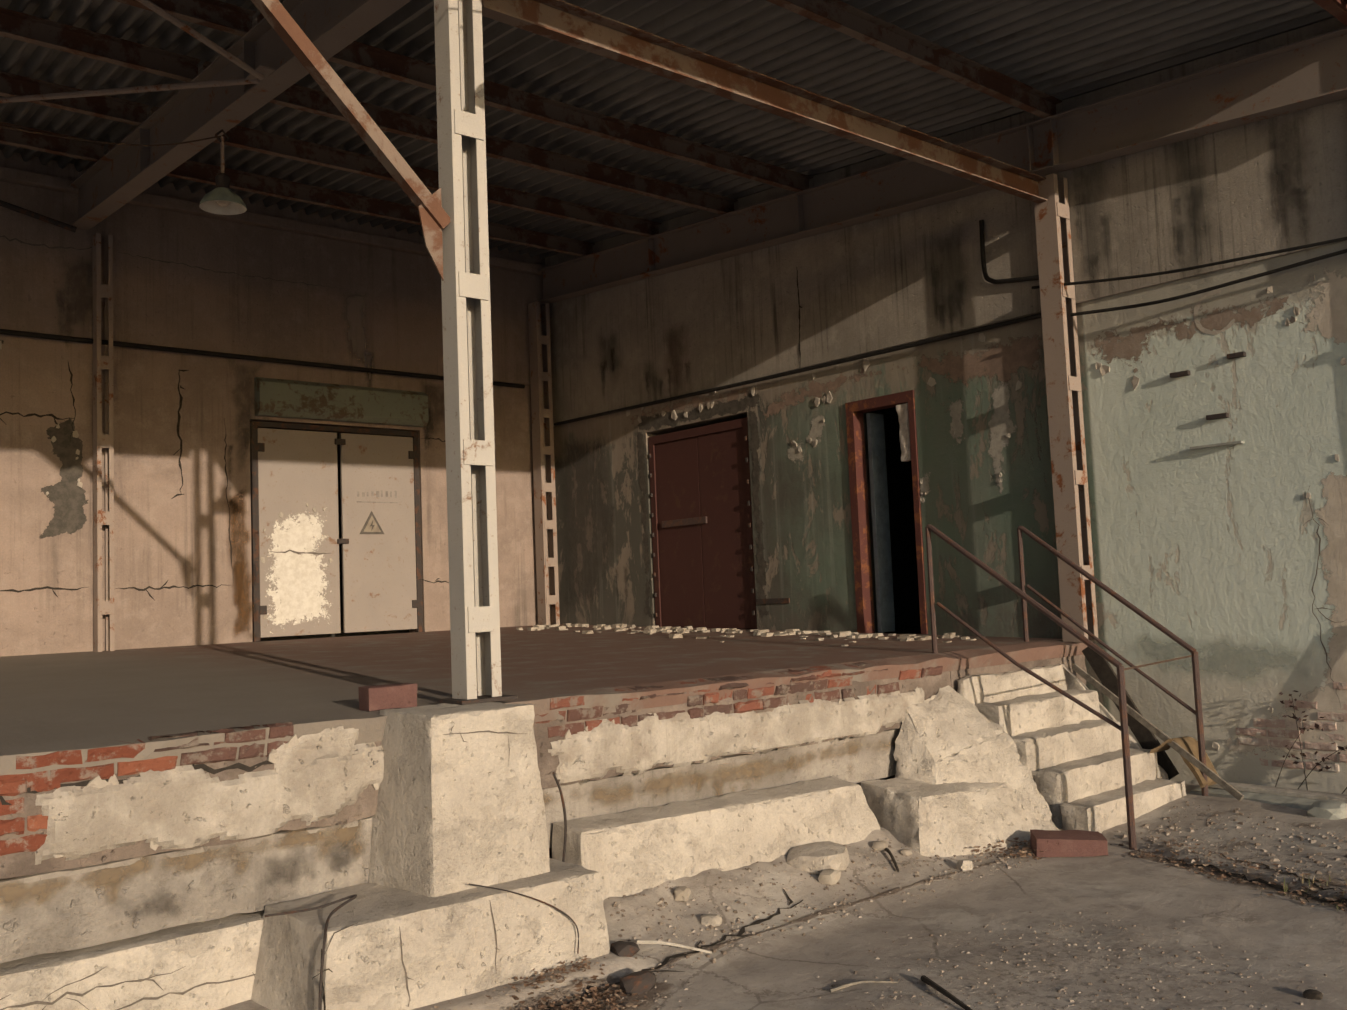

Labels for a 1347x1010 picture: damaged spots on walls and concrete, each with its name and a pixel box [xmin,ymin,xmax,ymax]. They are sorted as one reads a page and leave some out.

peeling [1091,266,1347,390]
crack [0,363,76,442]
spalling [39,418,88,538]
crack [171,369,189,499]
peeling [987,381,1018,494]
peeling [261,503,333,634]
peeling [1212,454,1347,773]
crack [1307,486,1347,707]
flaking render [0,722,384,865]
crack [0,966,256,1010]